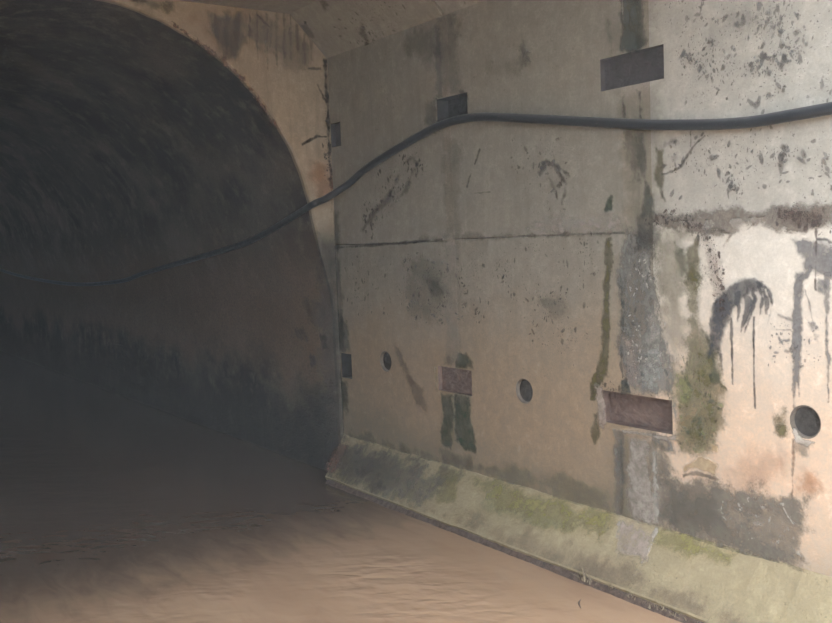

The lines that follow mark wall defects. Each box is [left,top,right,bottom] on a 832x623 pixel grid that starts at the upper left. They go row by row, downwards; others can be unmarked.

water stain [617,182,675,395]
water stain [708,278,773,378]
water stain [768,229,832,402]
water stain [331,437,463,503]
water stain [614,432,810,565]